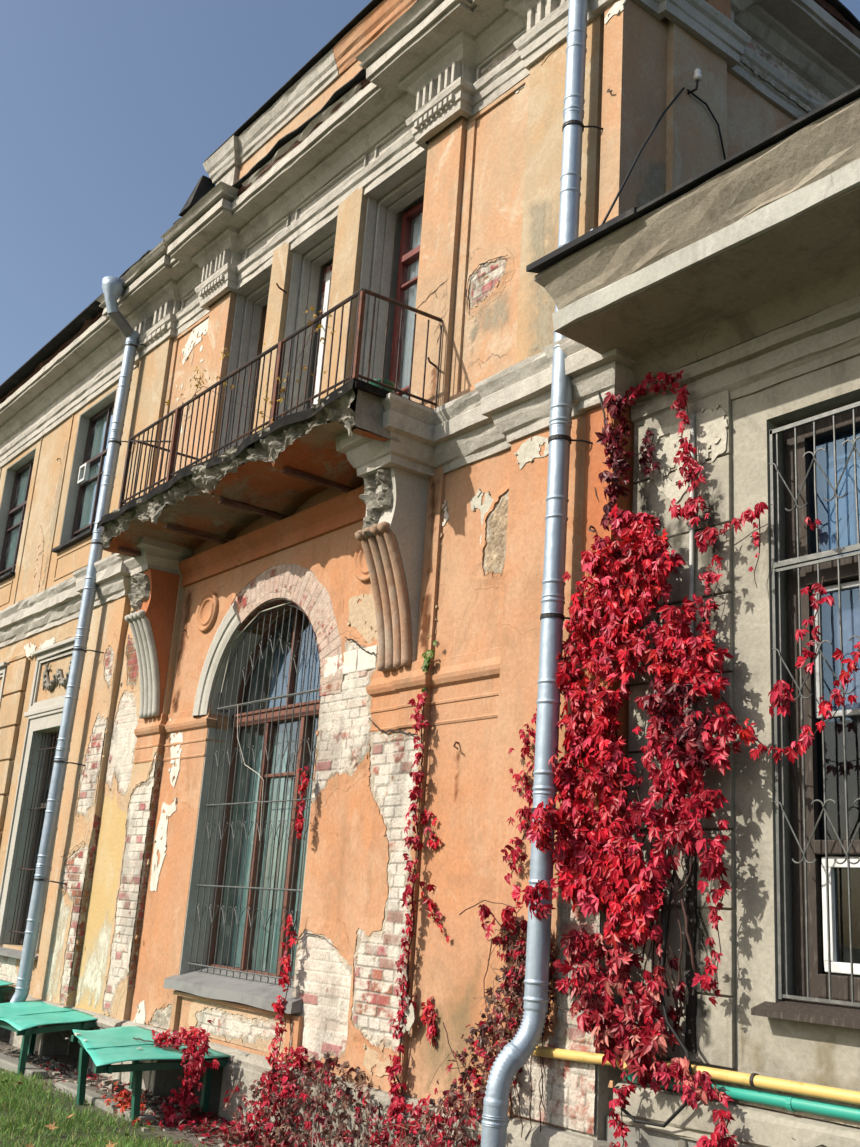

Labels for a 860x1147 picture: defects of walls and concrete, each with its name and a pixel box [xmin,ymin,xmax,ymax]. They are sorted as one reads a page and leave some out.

flaking render [465,248,516,320]
spalling [100,388,401,557]
flaking render [470,436,549,592]
flaking render [55,626,183,1018]
flaking render [188,550,425,1077]
flaking render [133,990,178,1032]